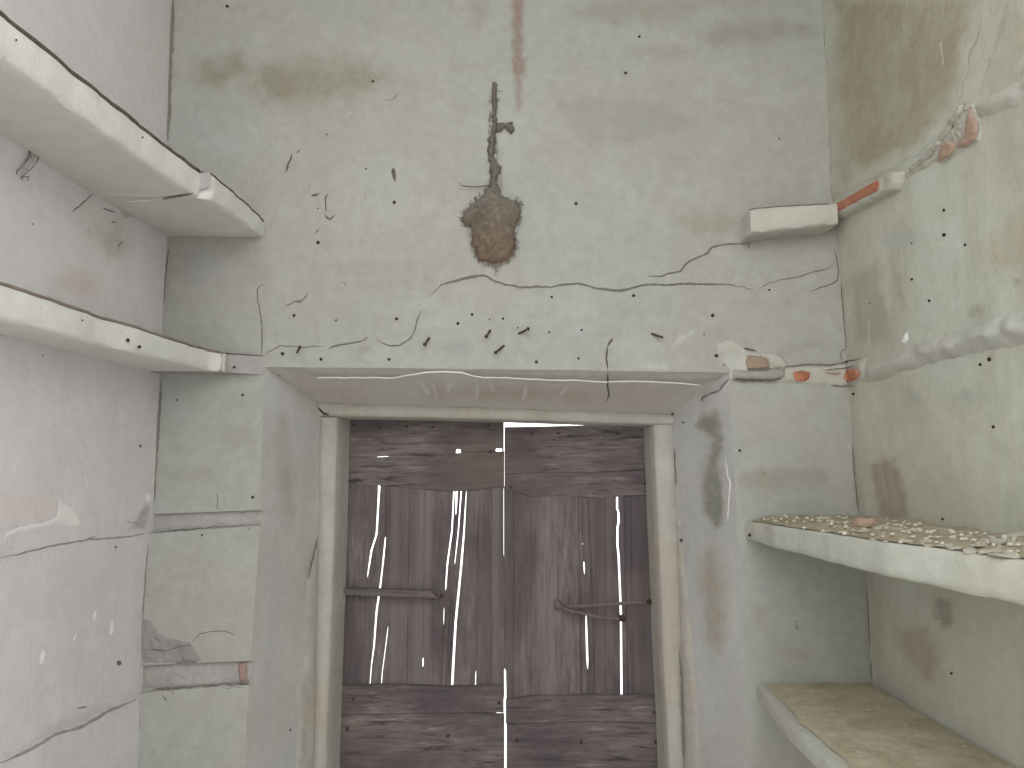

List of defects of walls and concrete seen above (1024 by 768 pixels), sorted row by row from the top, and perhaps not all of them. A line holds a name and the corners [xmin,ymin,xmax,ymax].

corrosion [508,0,530,115]
spalling [832,102,983,219]
crack [257,243,846,361]
spalling [282,322,871,403]
crack [605,338,613,402]
crack [2,494,260,618]
water stain [692,405,832,664]
spalling [141,618,234,664]
crack [0,682,249,765]